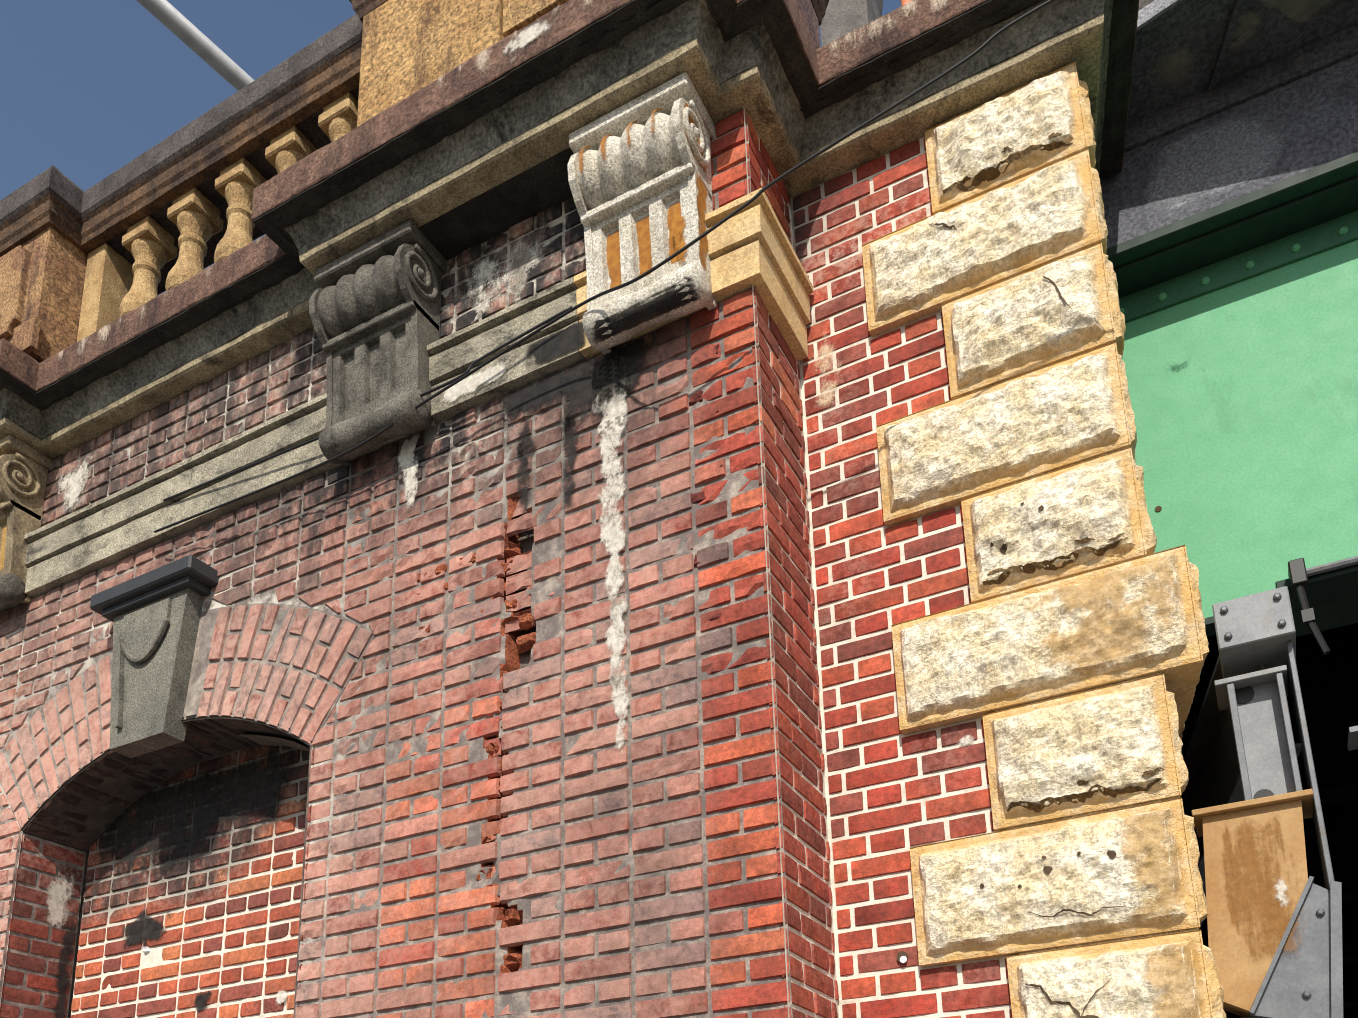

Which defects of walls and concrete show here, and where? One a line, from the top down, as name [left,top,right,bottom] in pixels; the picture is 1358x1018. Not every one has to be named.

corrosion [667,102,709,269]
spalling [942,132,1073,194]
corrosion [607,230,621,289]
corrosion [636,216,652,276]
crack [1043,276,1072,309]
damp [398,435,419,505]
damp [562,416,580,508]
damp [592,353,629,747]
spalling [983,533,1128,585]
spalling [501,541,536,654]
spalling [1007,767,1164,813]
crack [1025,978,1111,1018]